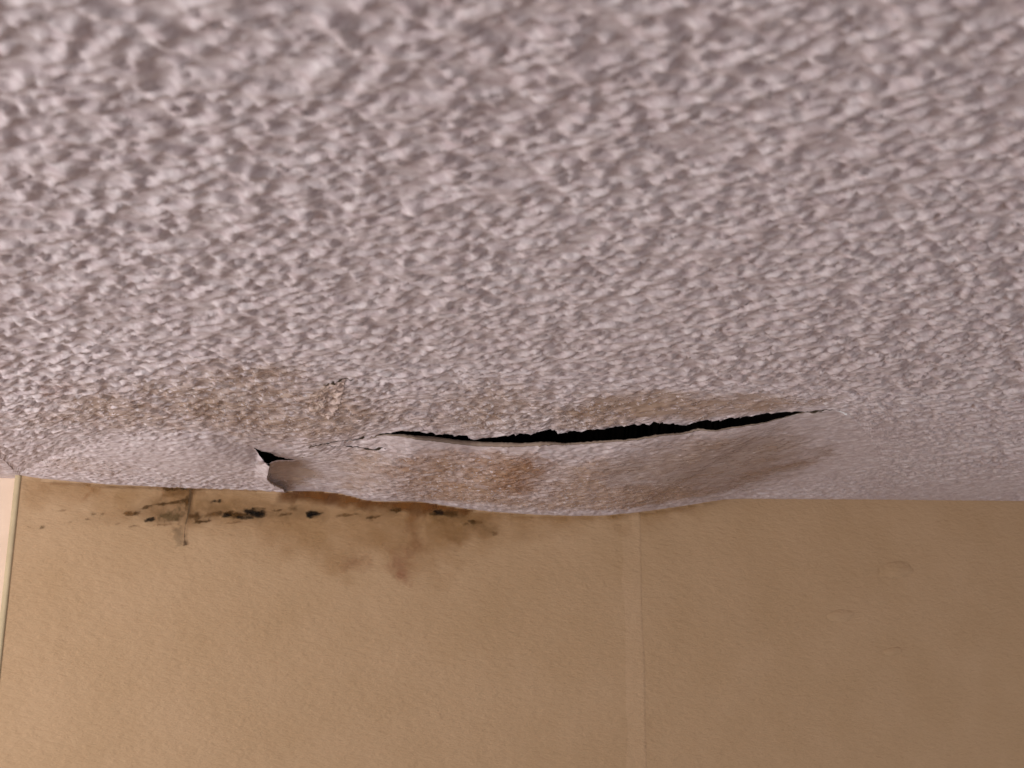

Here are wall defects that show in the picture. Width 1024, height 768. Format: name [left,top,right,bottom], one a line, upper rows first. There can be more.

crack [309,409,830,451]
leakage [124,487,285,546]